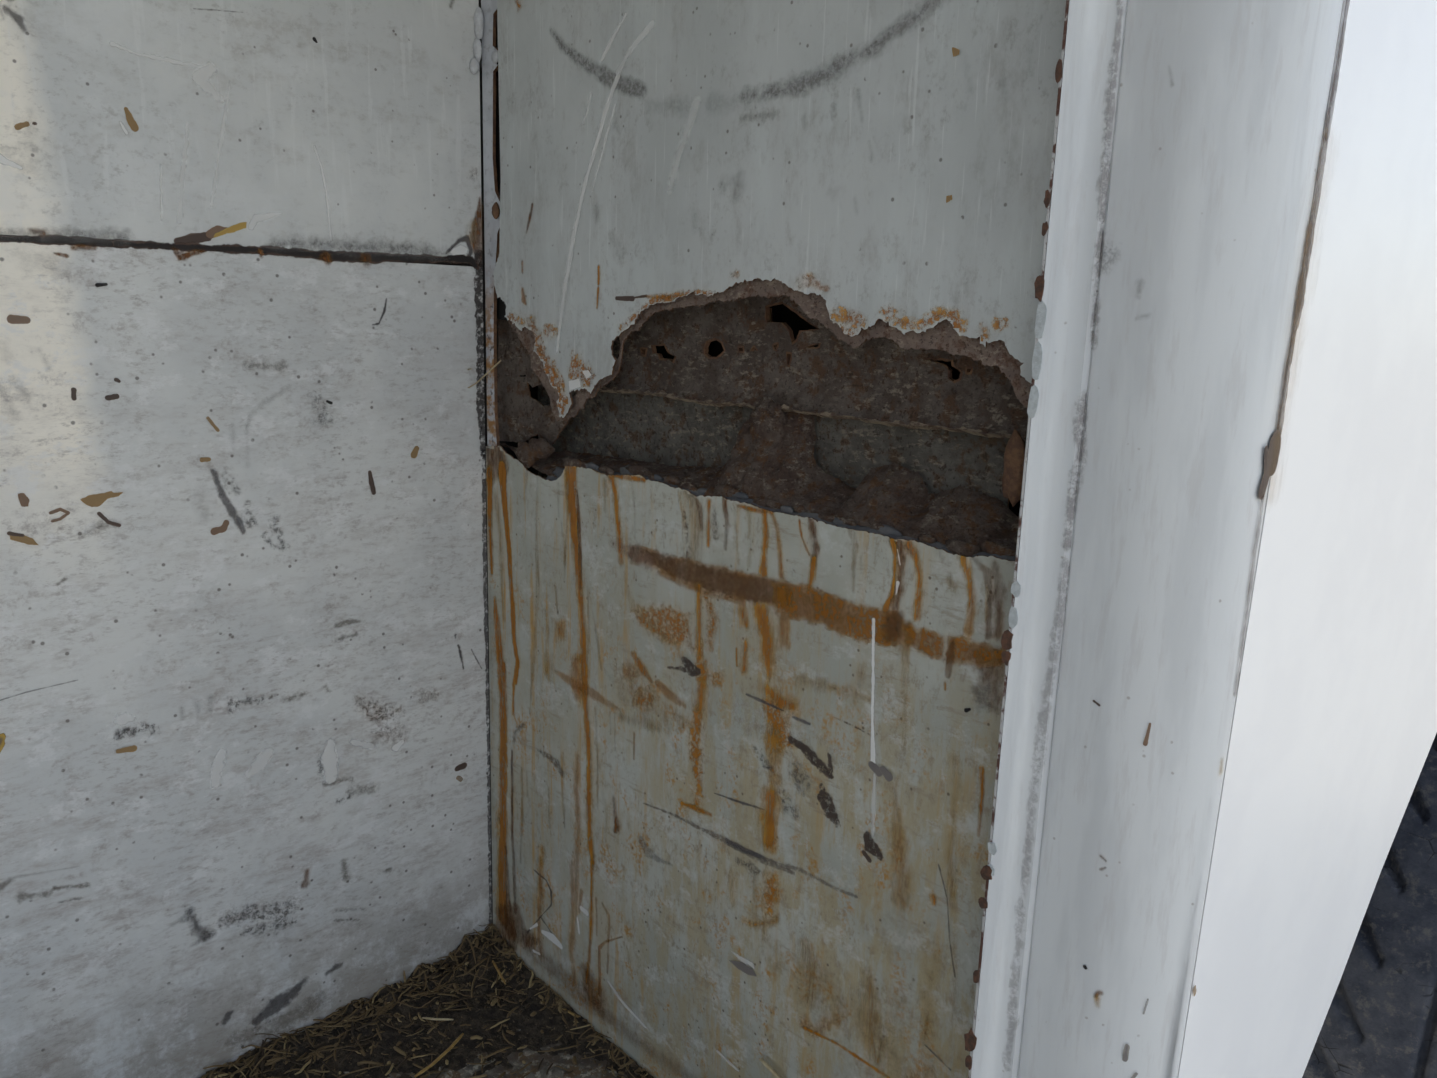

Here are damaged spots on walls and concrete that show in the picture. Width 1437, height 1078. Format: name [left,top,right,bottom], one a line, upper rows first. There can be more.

rust [1042,190,1051,236]
rust [1034,275,1045,302]
peeling [1027,301,1047,418]
peeling [781,404,1026,441]
peeling [1008,581,1021,629]
rust [486,438,1016,1005]
rust [964,1028,977,1070]